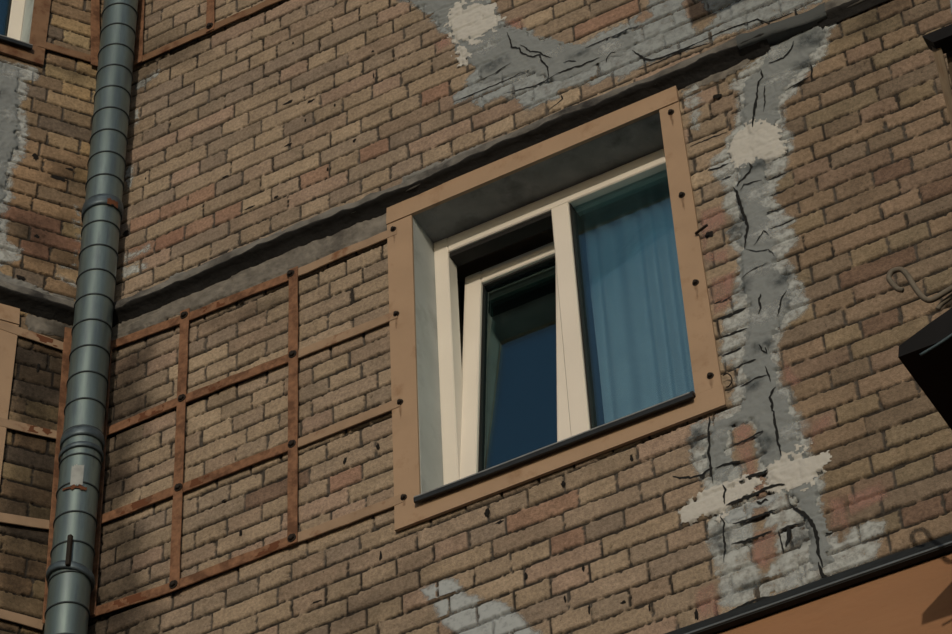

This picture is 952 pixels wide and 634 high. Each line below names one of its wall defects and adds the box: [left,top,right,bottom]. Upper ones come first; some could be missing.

crack [452,8,813,127]
crack [672,163,827,578]